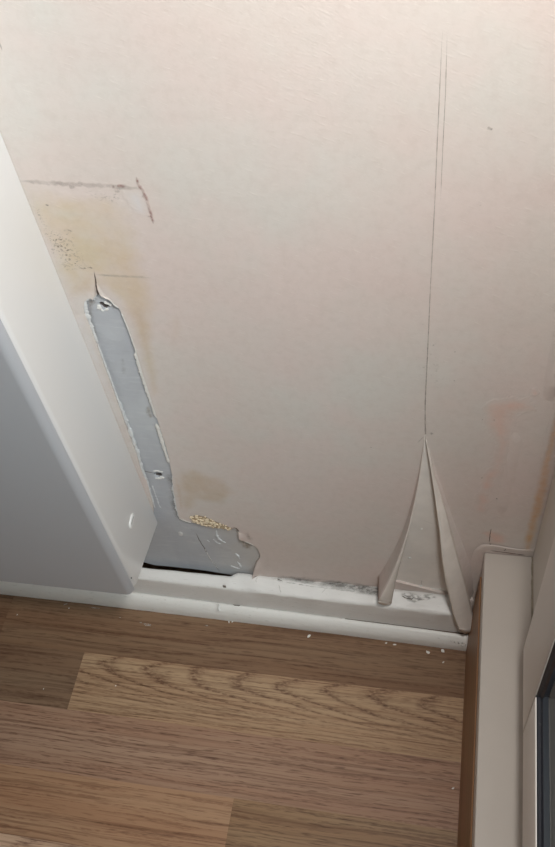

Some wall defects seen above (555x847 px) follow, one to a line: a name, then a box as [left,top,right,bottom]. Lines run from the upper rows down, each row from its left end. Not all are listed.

water stain [20,180,186,437]
peeling [84,294,267,579]